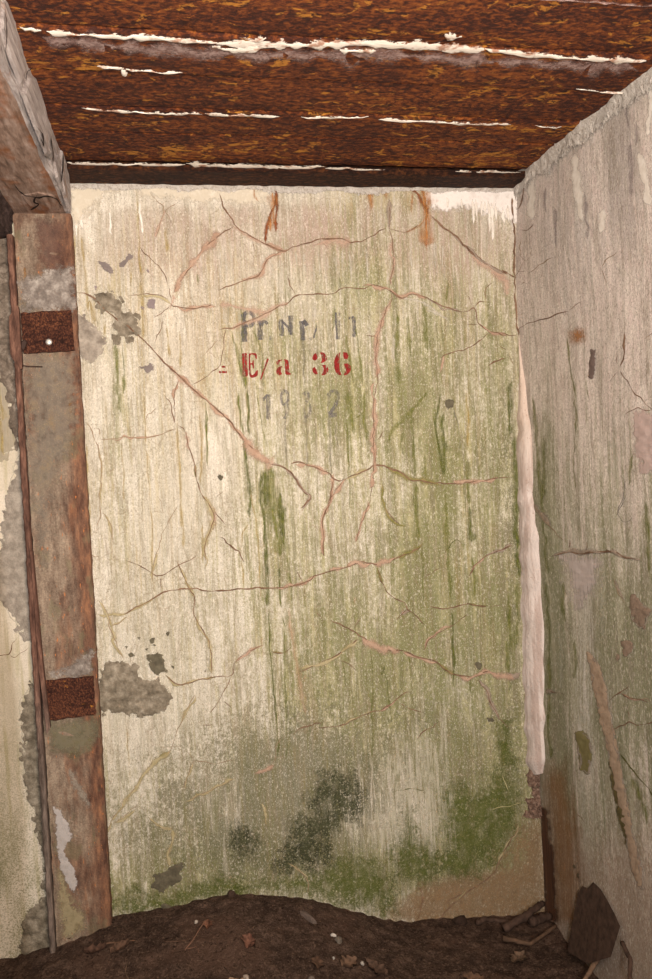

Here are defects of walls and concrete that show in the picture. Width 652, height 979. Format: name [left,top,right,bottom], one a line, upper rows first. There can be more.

damp [97,65,182,77]
damp [20,27,646,75]
rust [264,191,278,242]
rust [411,190,431,248]
damp [425,179,546,240]
peeling [78,286,155,363]
crack [612,333,652,414]
peeling [0,238,31,642]
crack [77,188,580,866]
crack [534,504,640,560]
peeling [99,638,174,718]
damp [372,739,577,921]